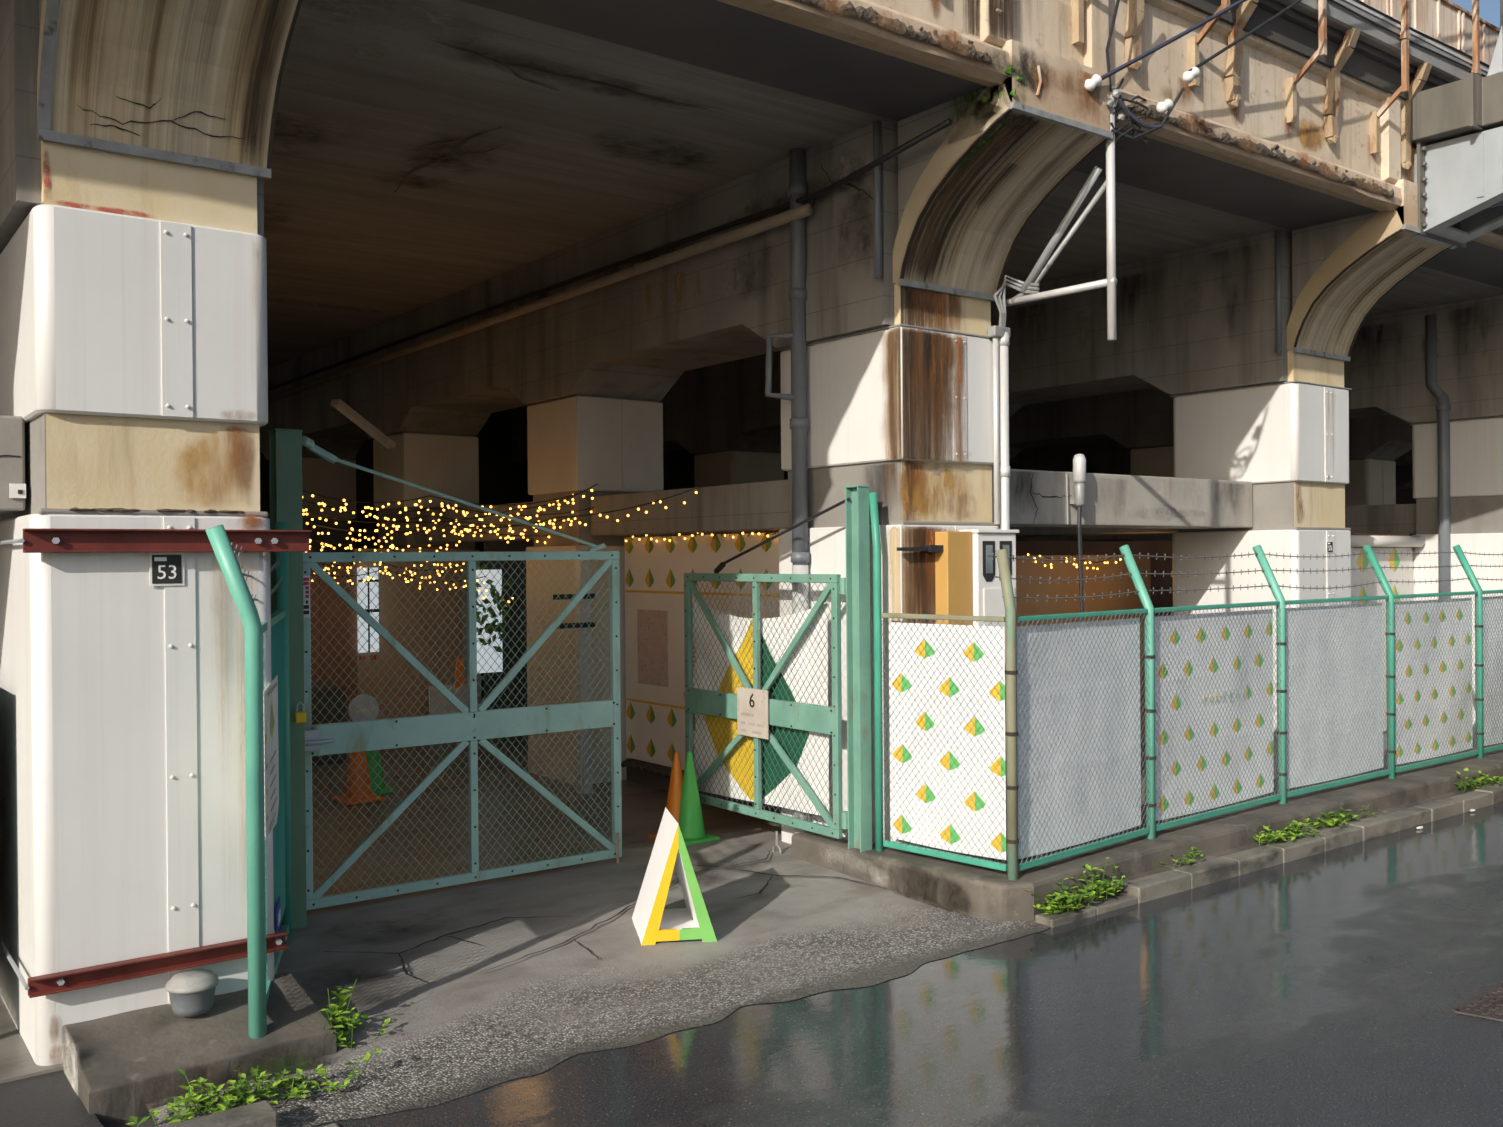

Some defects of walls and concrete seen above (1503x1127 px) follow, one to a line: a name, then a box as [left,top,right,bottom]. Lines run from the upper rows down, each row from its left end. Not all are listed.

crack [76,96,247,139]
leakage [232,0,318,151]
spalling [799,0,992,64]
leakage [907,115,1056,279]
spalling [1126,101,1394,198]
rust [888,286,963,462]
rust [890,527,938,624]